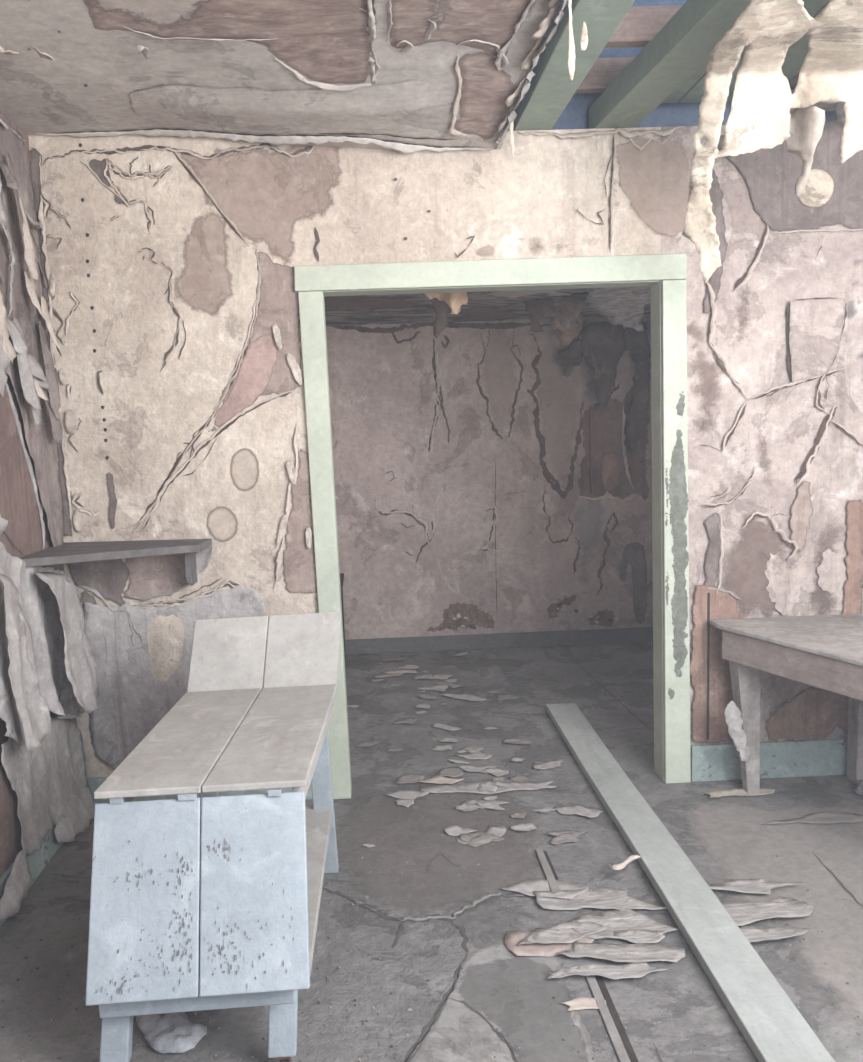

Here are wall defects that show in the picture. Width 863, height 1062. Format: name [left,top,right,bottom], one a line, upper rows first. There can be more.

crack [0,173,70,317]
peeling [41,183,56,201]
crack [35,128,491,533]
peeling [272,324,302,385]
crack [332,322,551,453]
peeling [676,394,685,416]
crack [700,224,863,486]
peeling [619,542,647,624]
peeling [665,430,689,699]
crack [701,466,799,561]
crack [323,841,560,1062]
crack [586,975,663,1062]